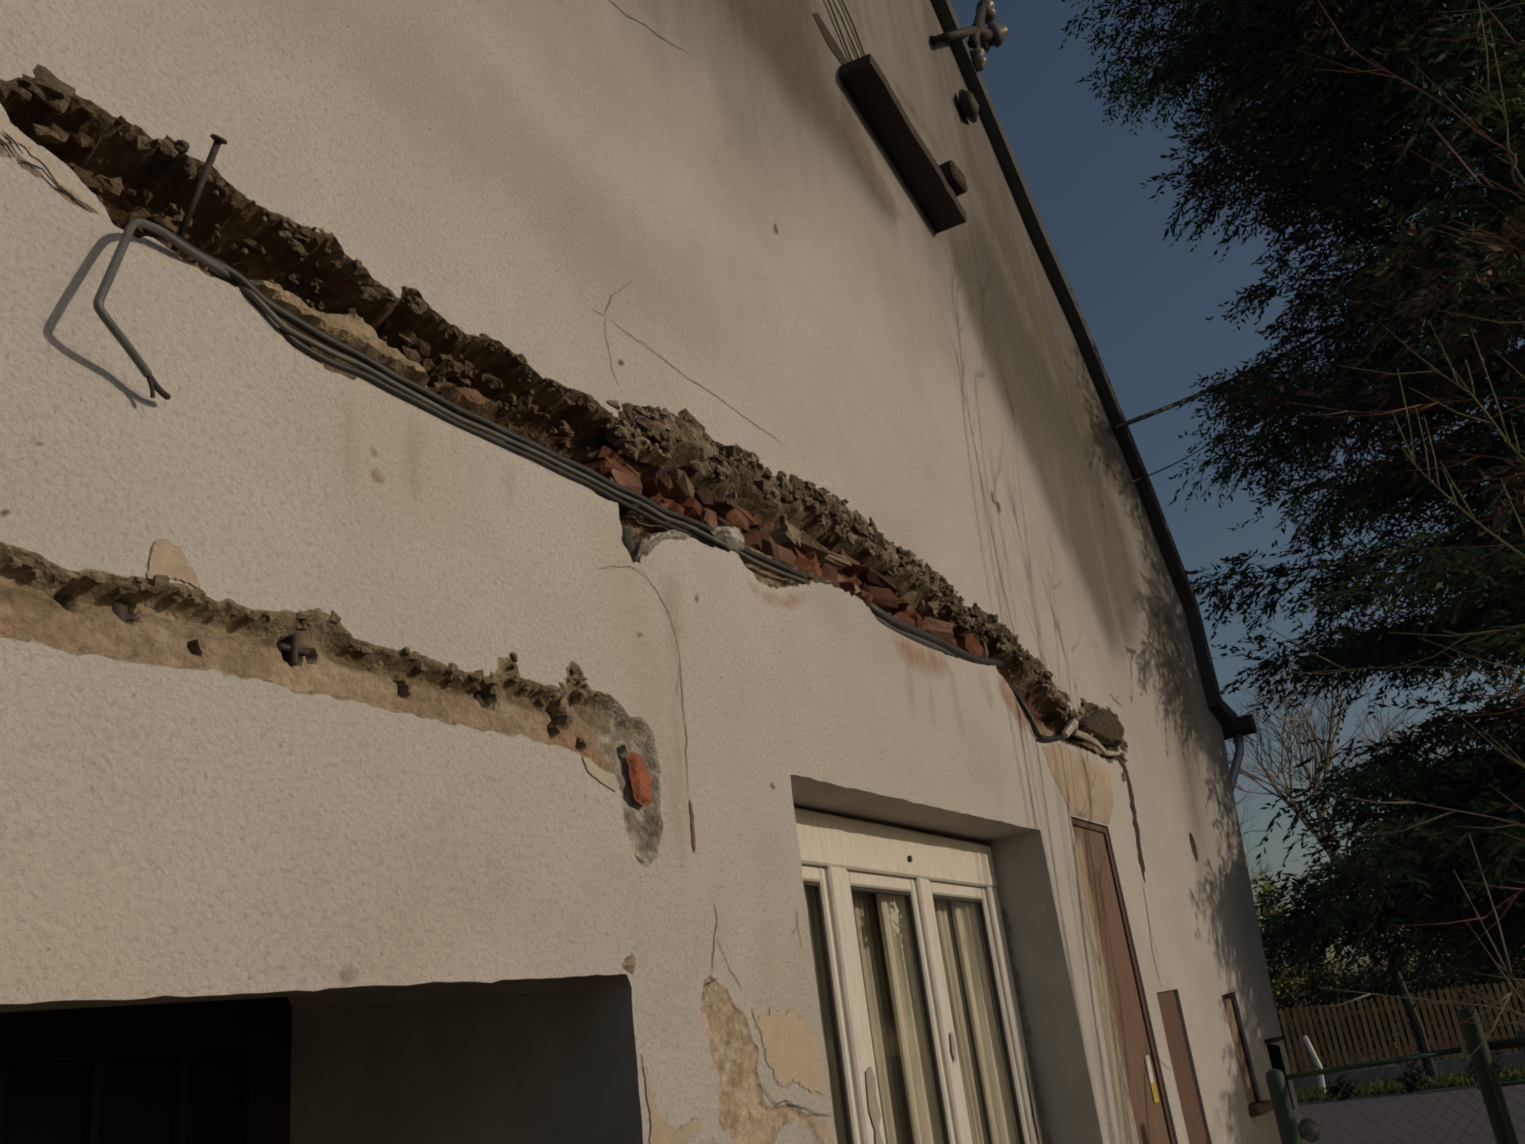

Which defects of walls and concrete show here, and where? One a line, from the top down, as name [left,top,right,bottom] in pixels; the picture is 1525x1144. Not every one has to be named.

crack [610,0,688,53]
spalling [0,64,1128,782]
peeling [583,757,620,791]
crack [1109,748,1161,984]
peeling [642,1054,701,1144]
peeling [700,974,833,1144]